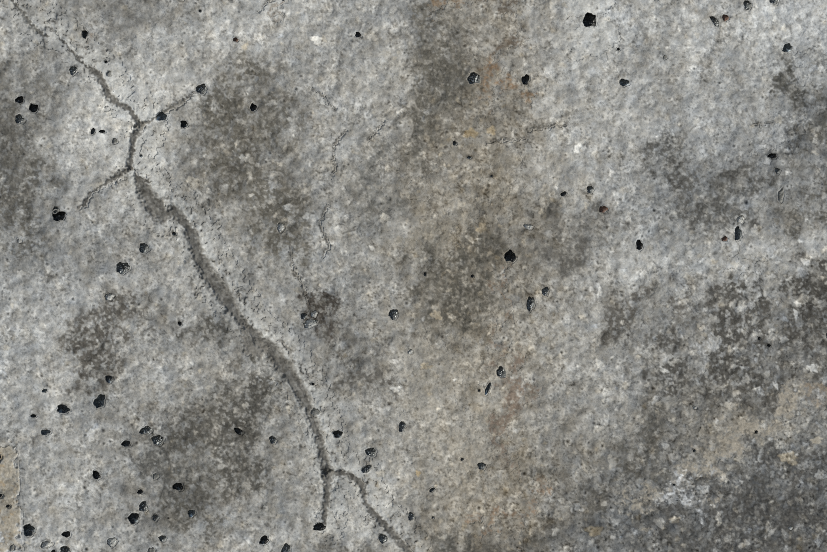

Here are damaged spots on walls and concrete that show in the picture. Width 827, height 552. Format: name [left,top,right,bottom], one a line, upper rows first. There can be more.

leakage [0,58,71,271]
crack [1,0,435,552]
leakage [184,50,318,273]
leakage [638,0,827,240]
leakage [520,242,827,552]